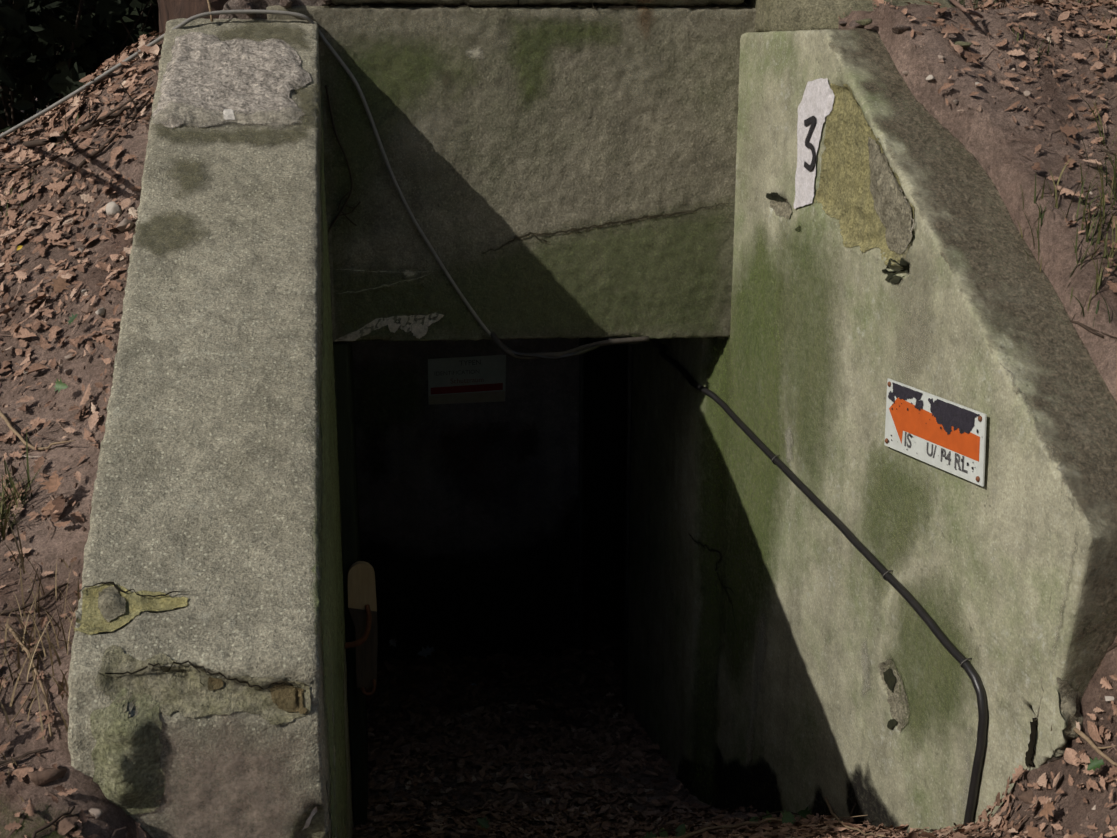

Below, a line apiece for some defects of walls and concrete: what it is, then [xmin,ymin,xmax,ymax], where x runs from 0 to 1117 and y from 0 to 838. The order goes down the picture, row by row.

crack [322,0,746,9]
spalling [814,83,915,284]
crack [485,203,728,253]
peeling [334,313,443,342]
spalling [74,582,311,725]
crack [98,660,309,690]
peeling [878,657,910,733]
leakage [676,748,782,817]
leakage [811,788,831,823]
leakage [846,769,908,835]